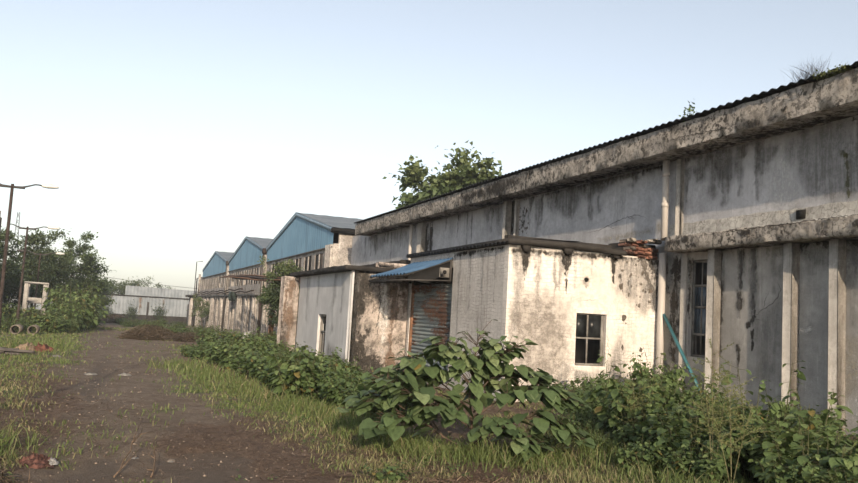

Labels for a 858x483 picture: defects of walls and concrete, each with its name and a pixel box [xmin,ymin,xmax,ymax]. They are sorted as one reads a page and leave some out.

water stain [361,106,858,255]
water stain [351,271,408,376]
water stain [454,236,784,371]